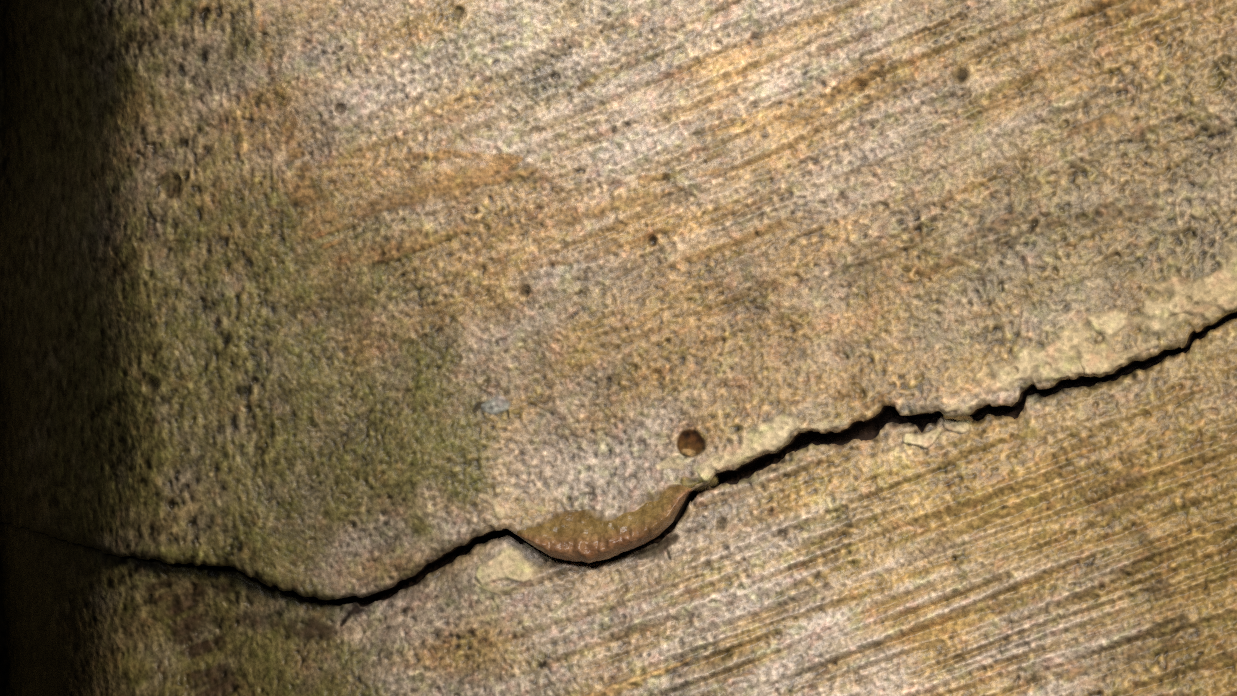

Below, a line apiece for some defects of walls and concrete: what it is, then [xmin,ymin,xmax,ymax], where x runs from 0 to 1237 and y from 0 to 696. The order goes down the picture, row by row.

crack [122,311,1237,626]